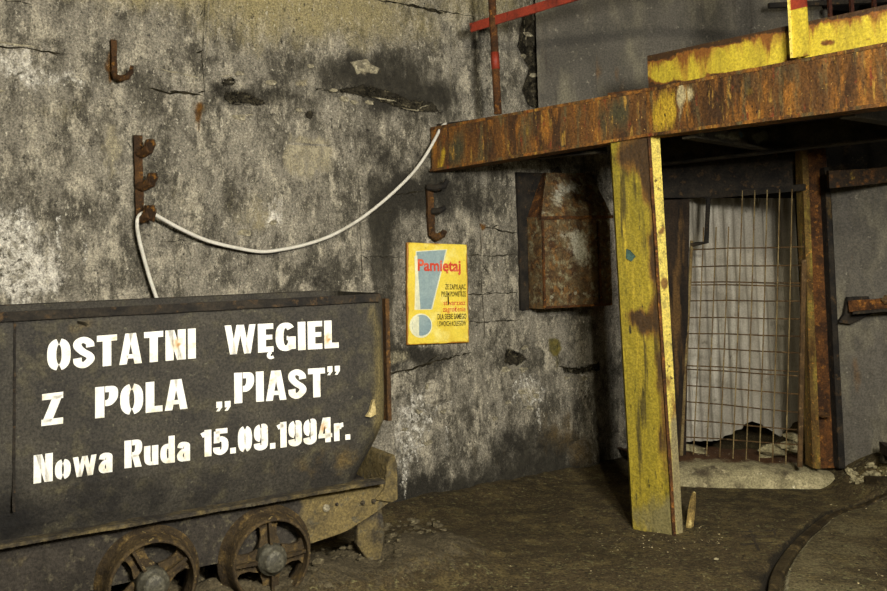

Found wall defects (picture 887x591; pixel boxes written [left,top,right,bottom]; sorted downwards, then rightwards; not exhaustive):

crack [367,0,474,17]
crack [0,41,61,56]
crack [150,1,209,108]
spalling [298,59,441,113]
damp [511,373,543,433]
damp [392,393,443,498]